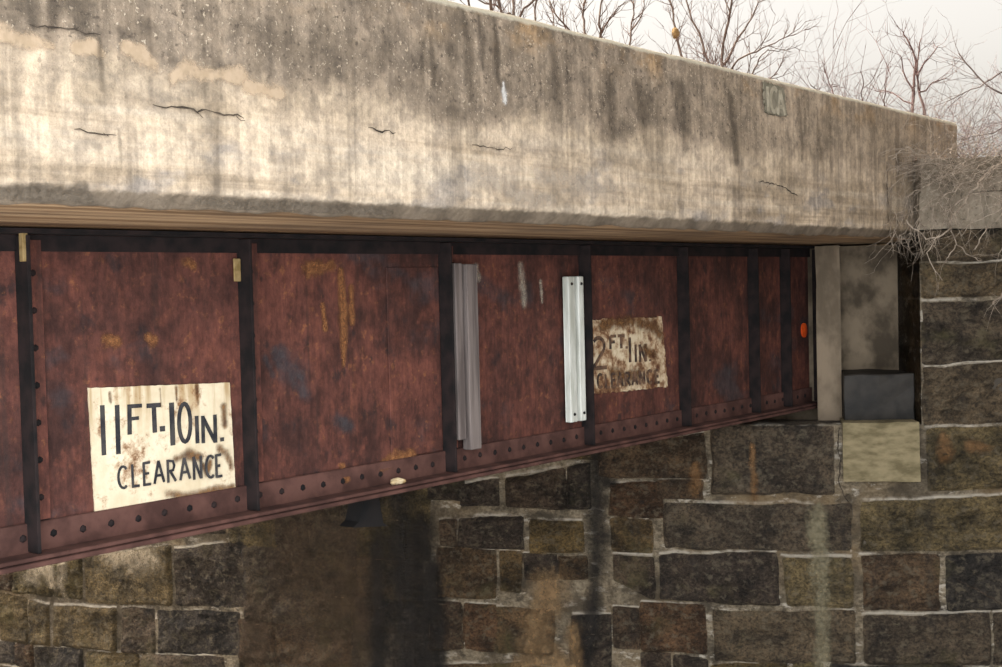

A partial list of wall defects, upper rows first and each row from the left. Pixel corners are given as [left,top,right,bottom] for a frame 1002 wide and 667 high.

crack [153,104,245,121]
crack [74,128,113,136]
corrosion [306,262,354,365]
corrosion [599,318,663,339]
corrosion [174,446,232,476]
corrosion [167,484,235,498]
water stain [369,492,446,667]